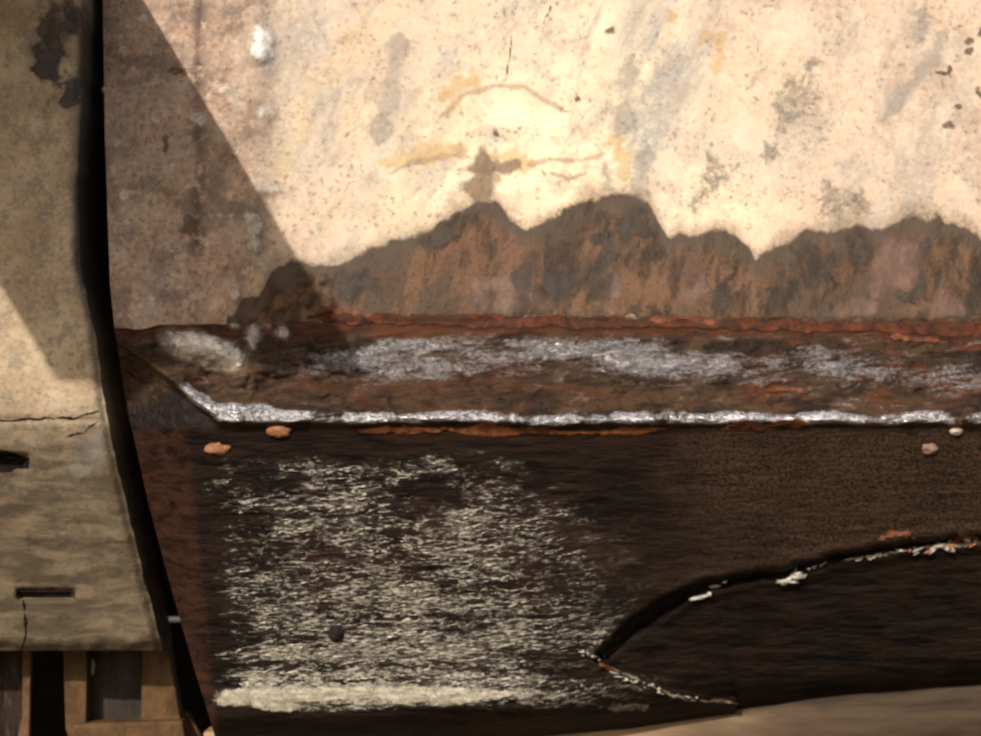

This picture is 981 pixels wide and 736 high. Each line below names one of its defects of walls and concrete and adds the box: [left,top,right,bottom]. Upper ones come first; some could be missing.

rust [307,305,981,343]
crack [0,411,99,438]
rust [725,418,808,431]
rust [204,442,231,455]